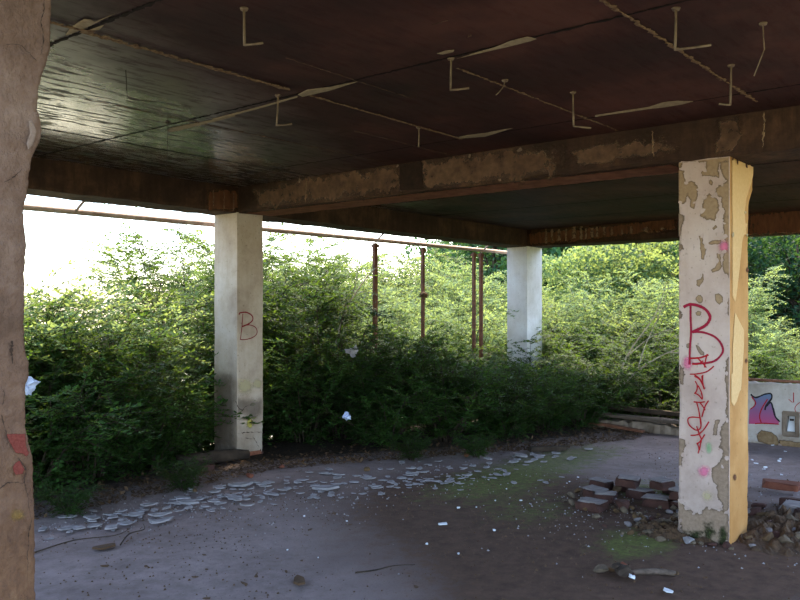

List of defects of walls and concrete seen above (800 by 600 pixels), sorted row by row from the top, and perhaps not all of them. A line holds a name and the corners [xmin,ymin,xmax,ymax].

crack [532,0,692,38]
crack [322,45,499,88]
crack [37,93,458,181]
peeling [252,165,402,210]
peeling [421,147,556,189]
peeling [570,118,753,543]